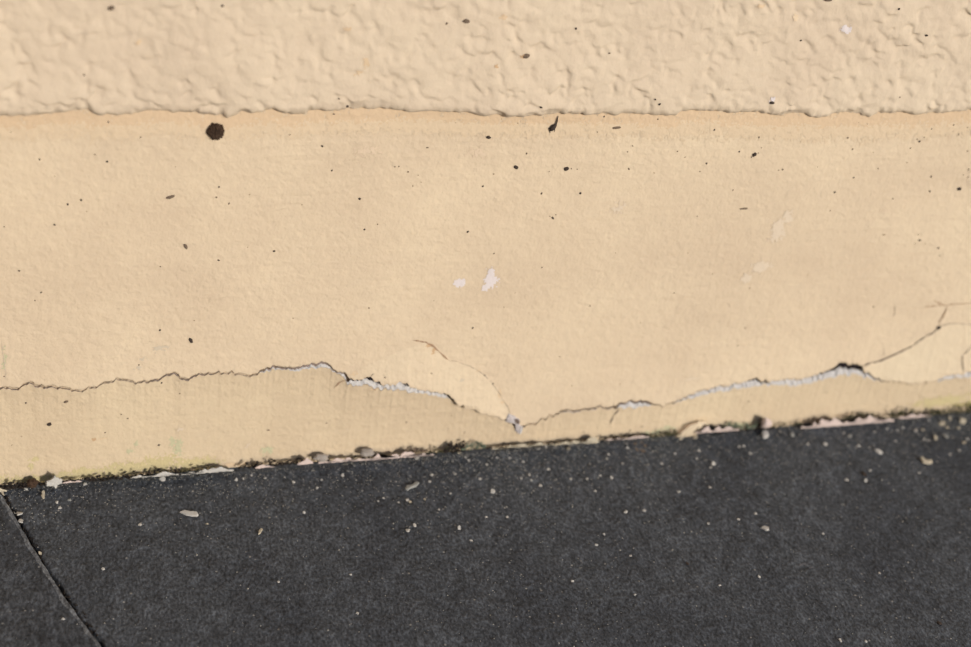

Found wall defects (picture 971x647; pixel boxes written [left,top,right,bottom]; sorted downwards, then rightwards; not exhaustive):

crack [863,300,971,385]
spalling [259,364,449,399]
crack [413,340,761,428]
spalling [674,367,882,404]
peeling [491,414,648,450]